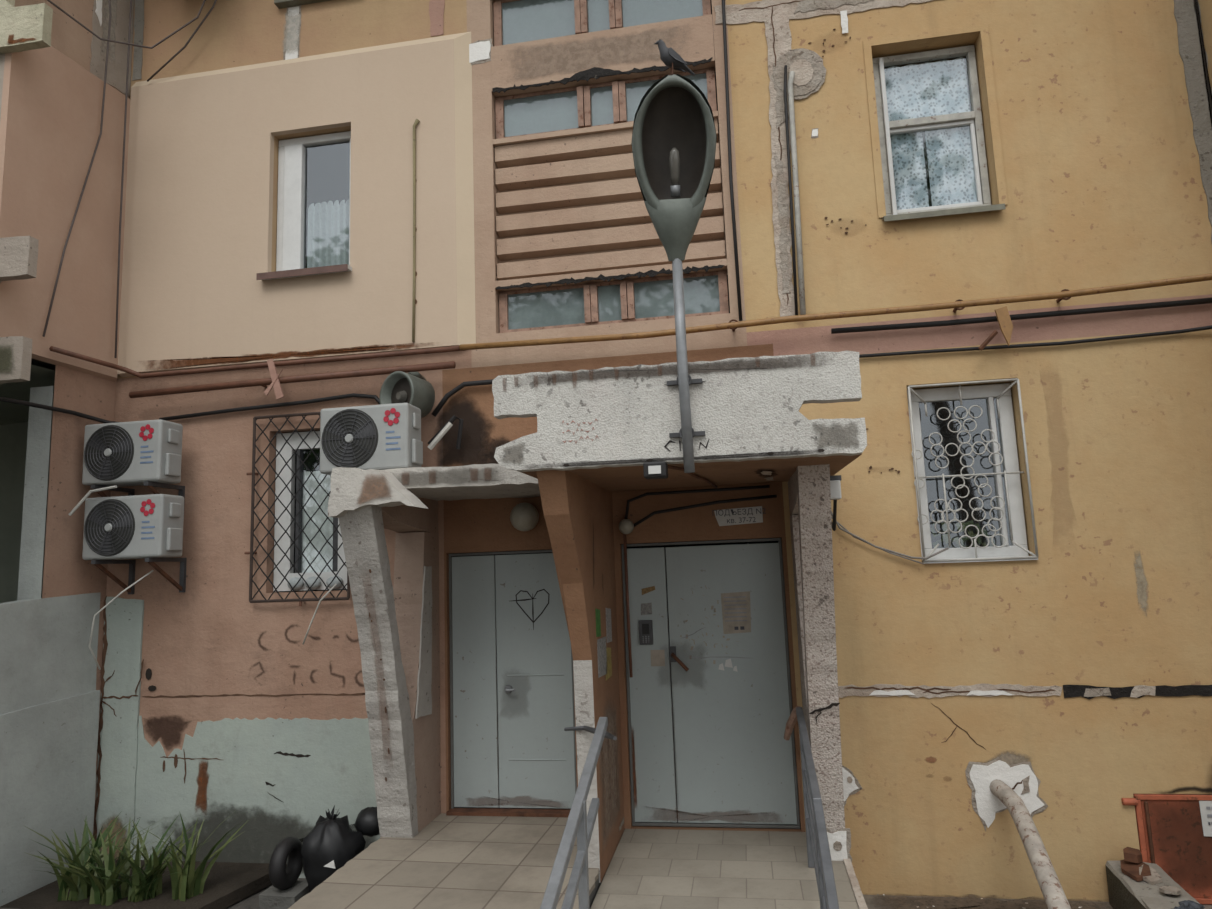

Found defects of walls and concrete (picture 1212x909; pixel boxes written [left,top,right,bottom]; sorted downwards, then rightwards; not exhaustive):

peeling [145,716,188,772]
crack [93,596,365,842]
crack [809,687,1055,750]
peeling [1012,775,1030,795]
water stain [1159,787,1212,881]